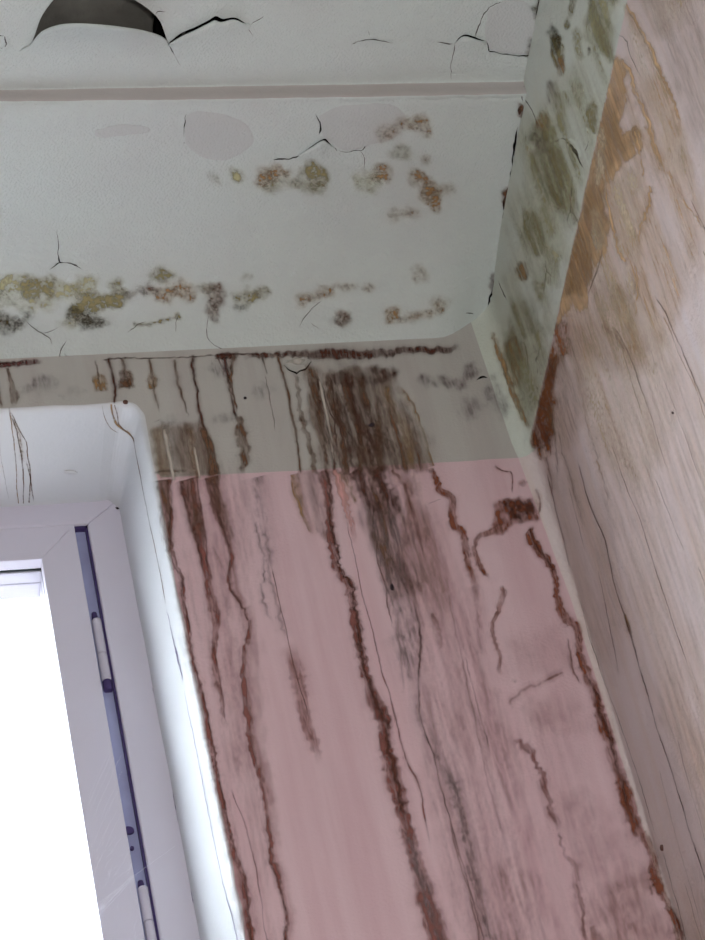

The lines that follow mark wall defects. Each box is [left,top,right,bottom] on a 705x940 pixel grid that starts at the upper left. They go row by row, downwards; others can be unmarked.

flaking render [19,0,263,75]
damp [257,167,296,190]
damp [305,162,328,186]
damp [411,160,442,211]
damp [523,0,697,408]
damp [0,275,124,331]
damp [143,268,195,301]
damp [207,283,223,320]
damp [492,304,541,424]
corrosion [474,467,683,940]